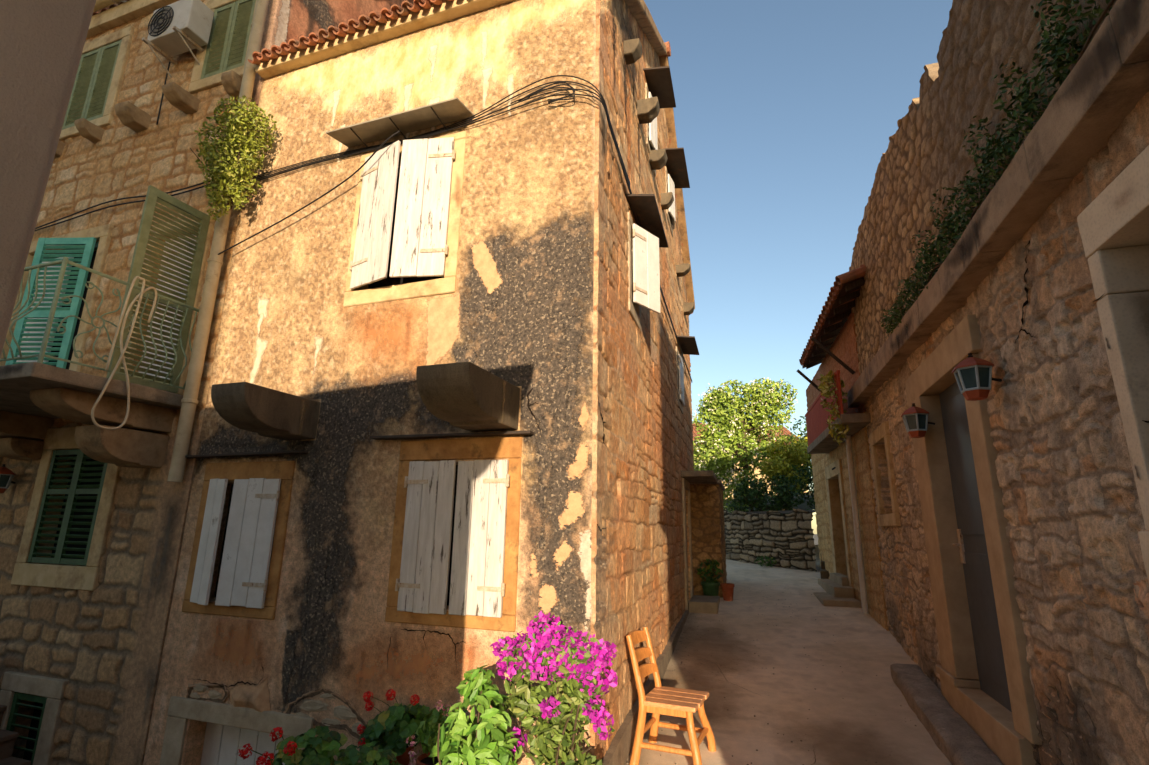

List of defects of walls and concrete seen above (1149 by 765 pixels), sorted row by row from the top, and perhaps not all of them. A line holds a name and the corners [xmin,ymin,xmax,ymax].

peeling [472,239,502,294]
leakage [249,297,269,384]
leakage [314,337,323,367]
leakage [453,211,609,635]
peeling [578,403,591,430]
leakage [197,368,458,713]
peeling [552,444,592,630]
peeling [529,550,560,615]
crack [386,629,465,674]